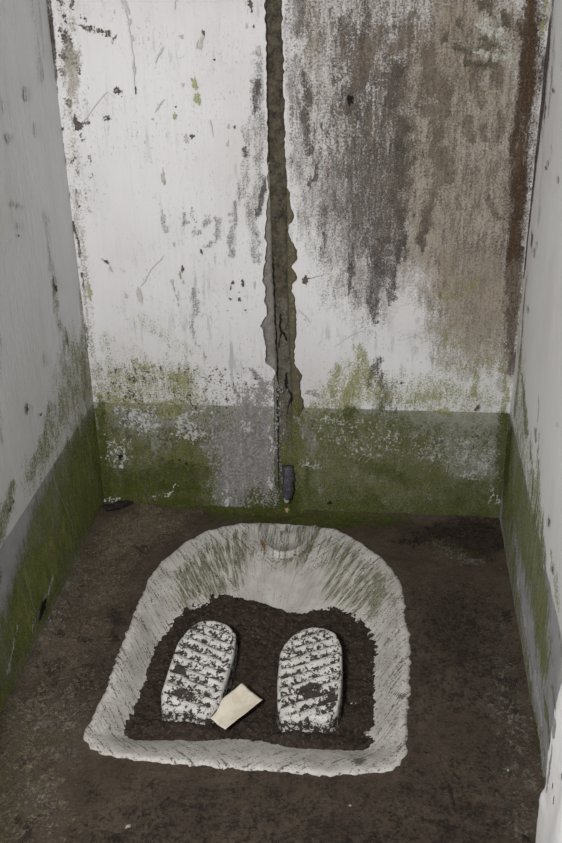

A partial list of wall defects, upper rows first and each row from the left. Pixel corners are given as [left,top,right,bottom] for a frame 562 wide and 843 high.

peeling [56,0,117,177]
flaking render [472,18,512,64]
peeling [70,0,502,508]
leakage [285,0,536,416]
corrosion [503,0,550,377]
crack [272,251,310,486]
leakage [0,481,15,542]
leakage [530,398,546,563]
leakage [411,590,555,776]
leakage [81,745,520,843]